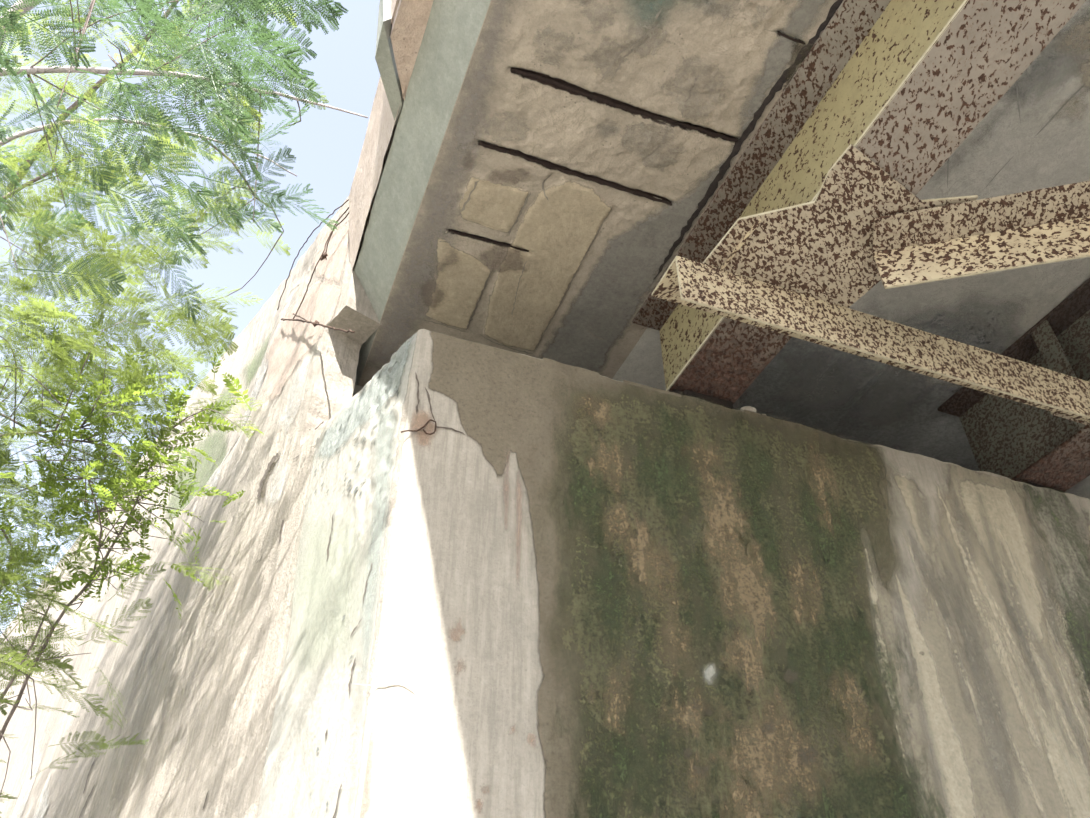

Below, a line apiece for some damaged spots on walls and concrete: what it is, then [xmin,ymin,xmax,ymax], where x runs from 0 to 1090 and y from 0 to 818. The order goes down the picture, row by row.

crack [457,177,480,217]
crack [419,209,612,354]
crack [509,174,552,235]
peeling [426,140,672,351]
damp [257,0,505,818]
damp [428,163,1090,818]